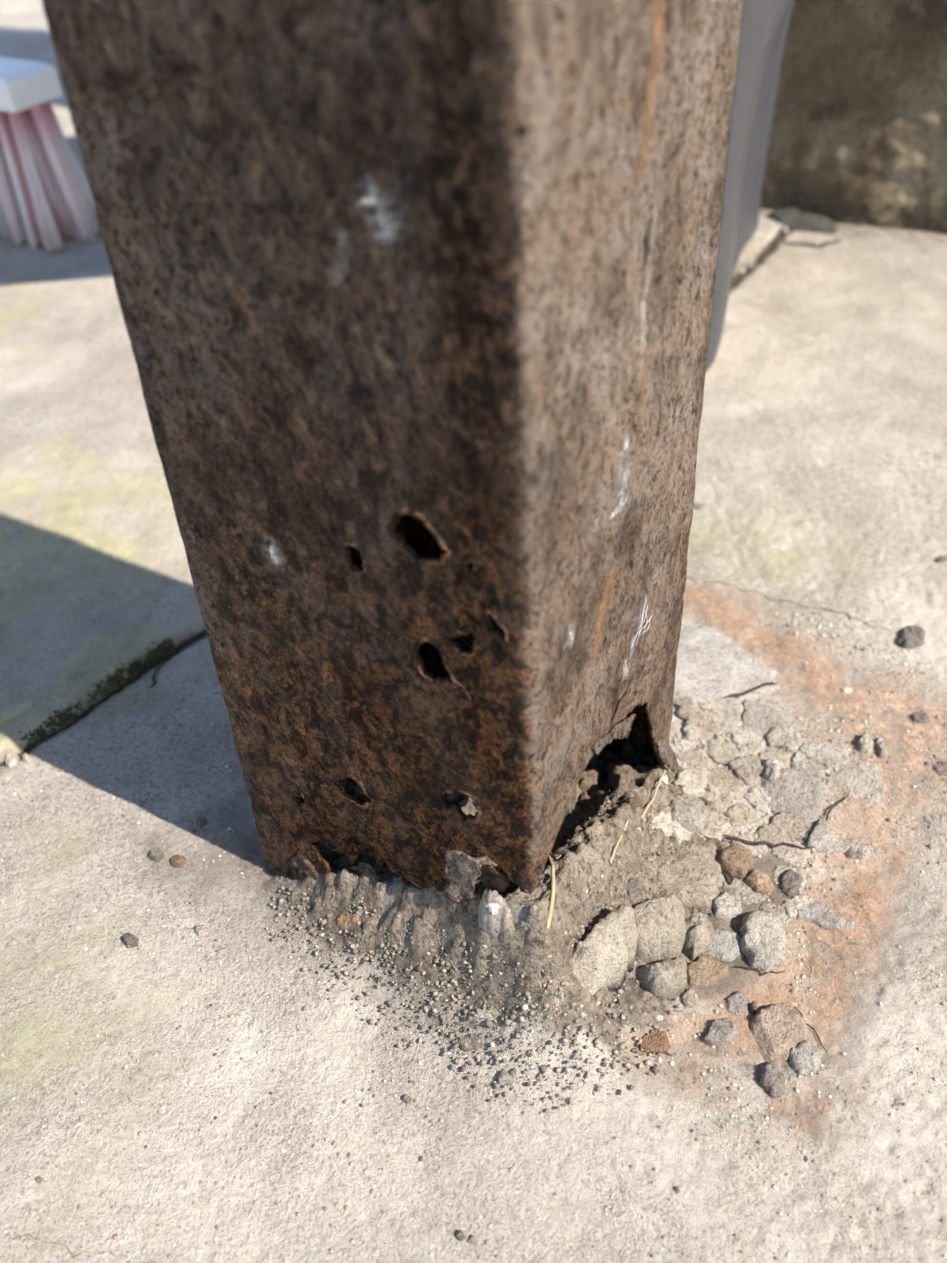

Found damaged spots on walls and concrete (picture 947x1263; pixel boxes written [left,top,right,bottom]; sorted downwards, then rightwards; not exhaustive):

corrosion [590,713,636,755]
corrosion [285,853,319,881]
corrosion [345,861,382,882]
corrosion [443,849,541,904]
corrosion [641,585,947,1127]
spalling [844,848,863,860]